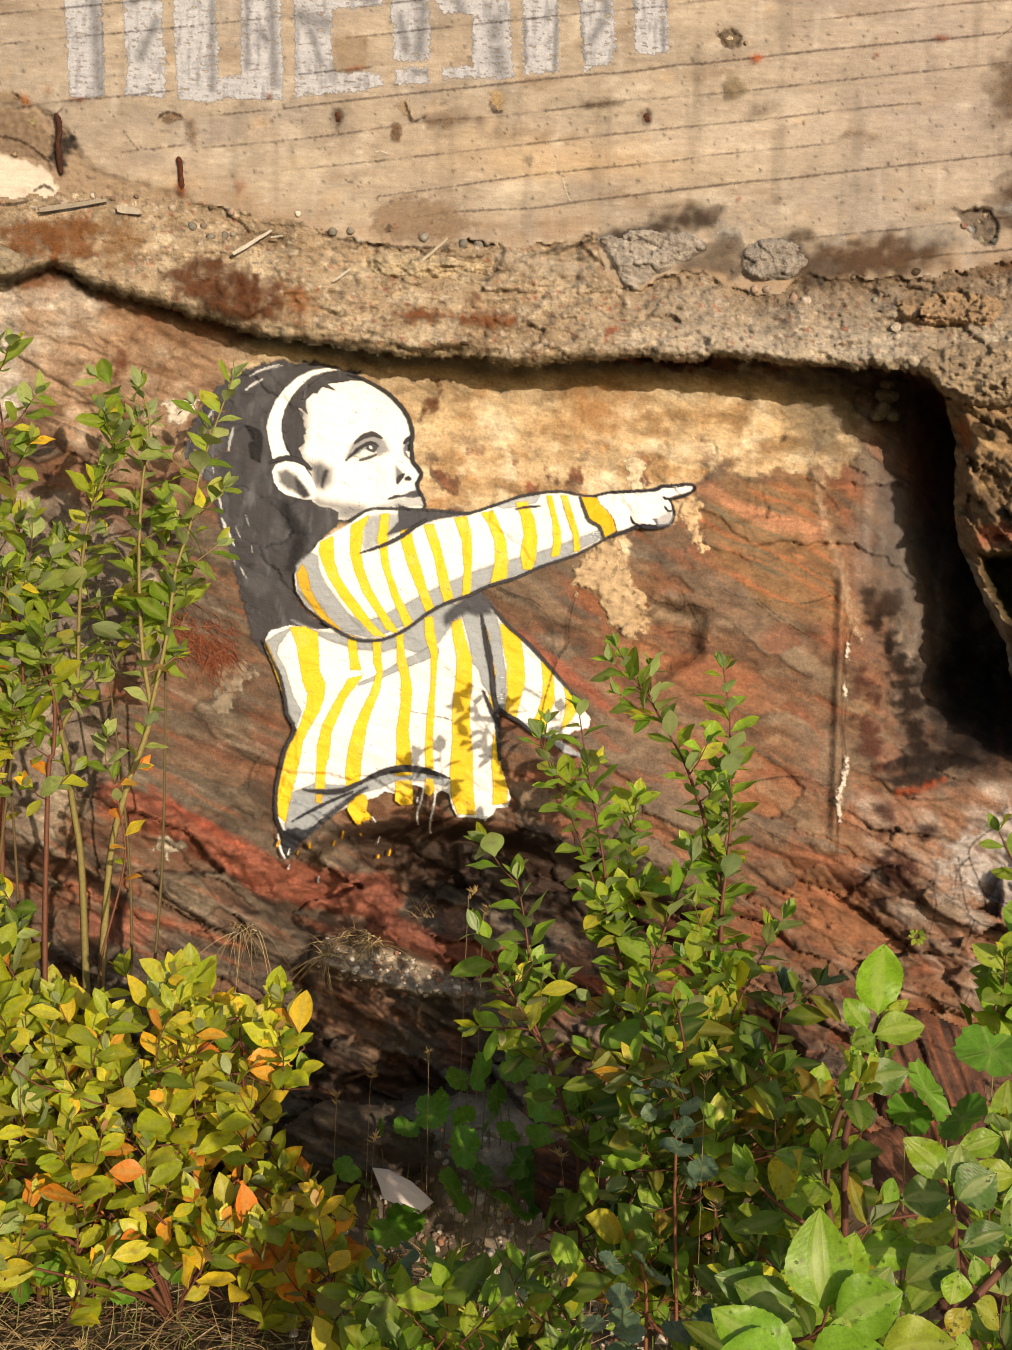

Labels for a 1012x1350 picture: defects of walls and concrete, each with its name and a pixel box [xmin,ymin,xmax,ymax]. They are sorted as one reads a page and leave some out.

spalling [0,91,28,102]
damp [997,63,1012,116]
spalling [159,111,184,122]
spalling [392,102,426,141]
spalling [0,135,50,162]
corrosion [54,113,63,174]
corrosion [176,156,185,196]
spalling [954,206,998,245]
spalling [366,252,486,279]
spalling [596,227,707,292]
spalling [740,237,809,282]